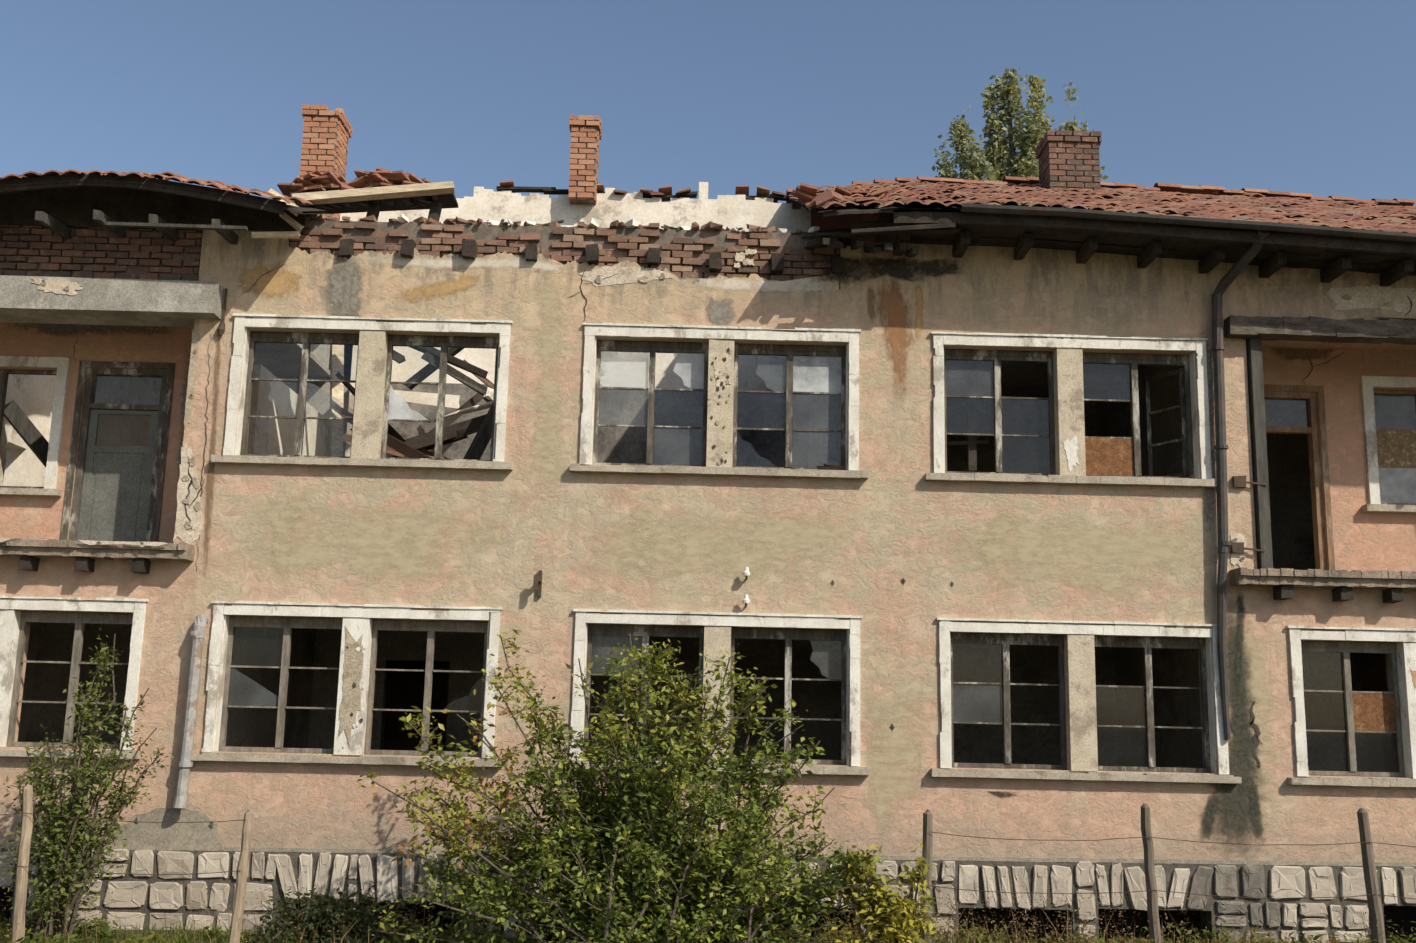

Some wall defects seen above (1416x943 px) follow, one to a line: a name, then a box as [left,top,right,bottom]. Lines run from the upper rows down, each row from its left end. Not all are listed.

crack [200,336,212,497]
leakage [1235,595,1273,836]
leakage [1203,796,1218,836]